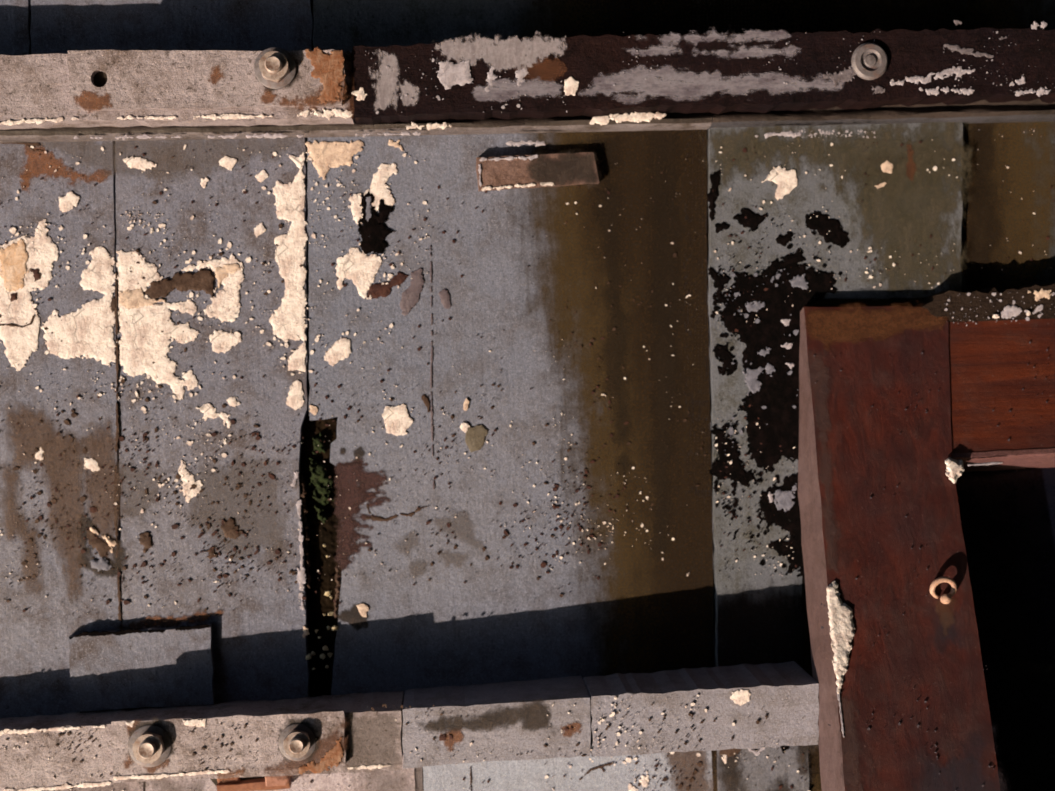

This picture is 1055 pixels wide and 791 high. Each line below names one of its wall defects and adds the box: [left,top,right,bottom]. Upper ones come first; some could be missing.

corrosion [261,47,355,118]
peeling [352,50,419,111]
peeling [435,30,856,126]
leakage [519,0,1055,39]
peeling [871,44,994,96]
peeling [0,219,245,399]
peeling [208,122,452,415]
leakage [3,406,122,593]
crack [300,245,435,697]
leakage [529,129,805,676]
peeling [708,231,837,581]
leakage [808,744,822,791]